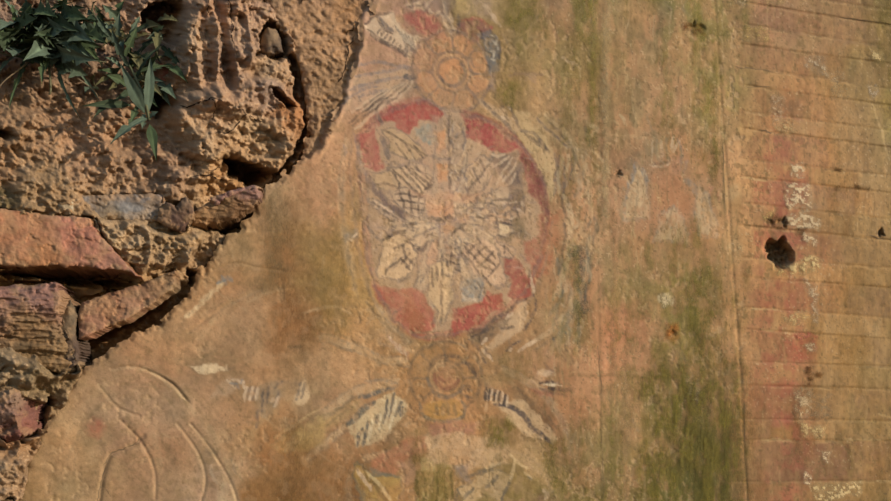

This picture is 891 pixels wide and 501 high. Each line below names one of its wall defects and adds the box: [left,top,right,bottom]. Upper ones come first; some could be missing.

water stain [773,165,821,351]
efflorescence [795,392,831,438]
efflorescence [804,473,861,501]